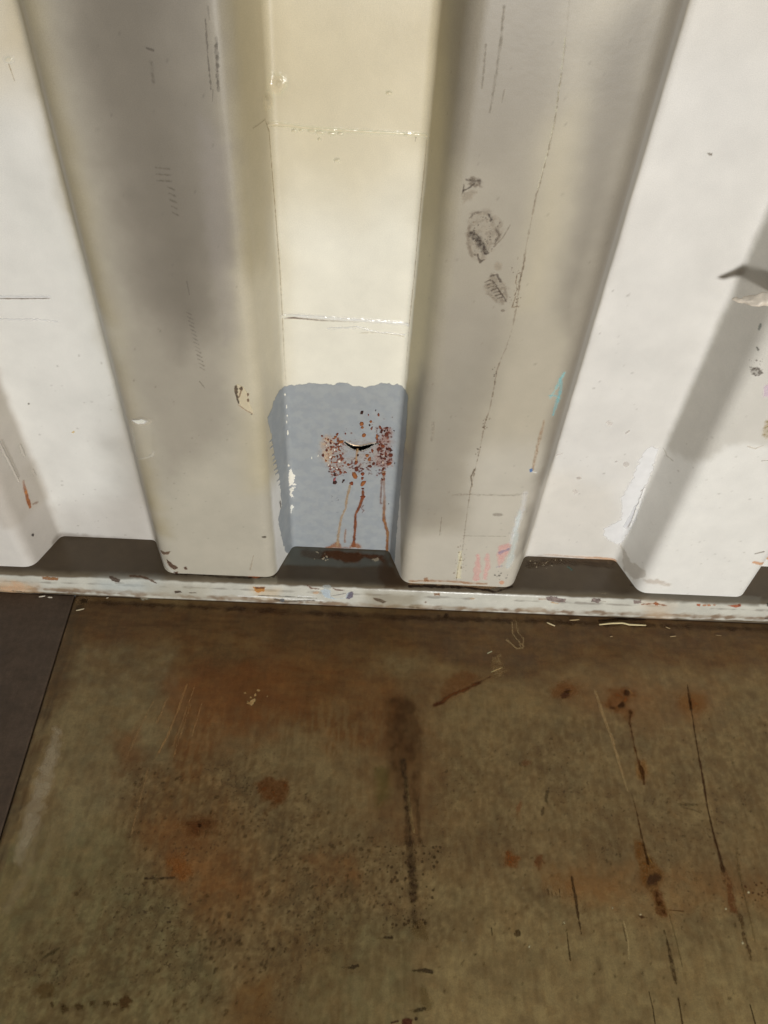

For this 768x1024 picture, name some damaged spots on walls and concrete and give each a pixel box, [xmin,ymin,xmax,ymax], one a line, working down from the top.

rust [317,410,395,563]
peeling [604,447,658,544]